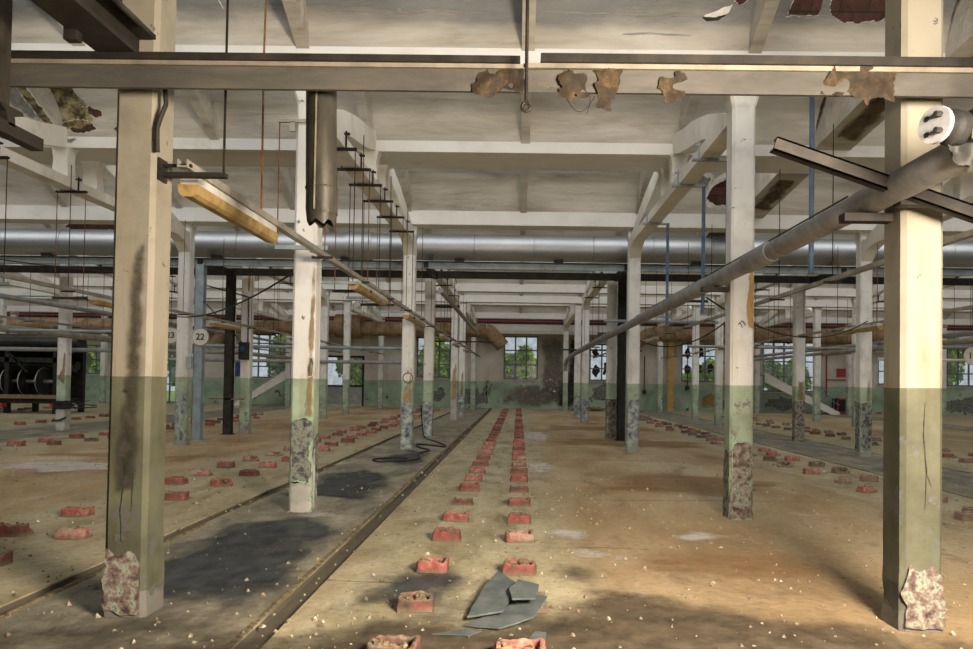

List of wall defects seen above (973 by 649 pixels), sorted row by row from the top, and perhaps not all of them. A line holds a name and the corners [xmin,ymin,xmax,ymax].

peeling [702,0,749,21]
flaking render [786,0,885,25]
flaking render [10,88,103,134]
flaking render [692,172,726,210]
peeling [854,401,872,453]
peeling [288,417,319,513]
peeling [723,441,754,520]
spalling [100,549,140,616]
spalling [901,565,946,630]